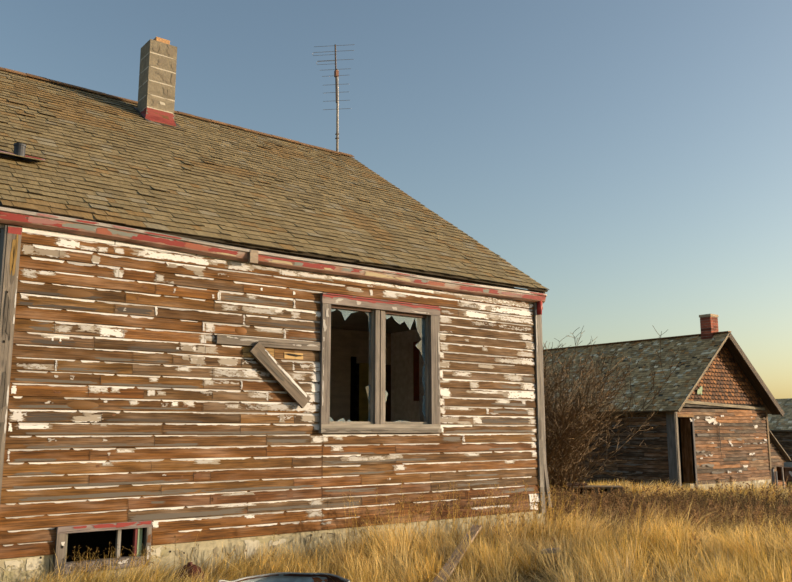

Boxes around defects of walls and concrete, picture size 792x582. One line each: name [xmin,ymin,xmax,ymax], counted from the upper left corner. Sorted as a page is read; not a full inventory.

peeling [218,492,256,518]
peeling [304,499,331,525]
spalling [244,539,259,559]